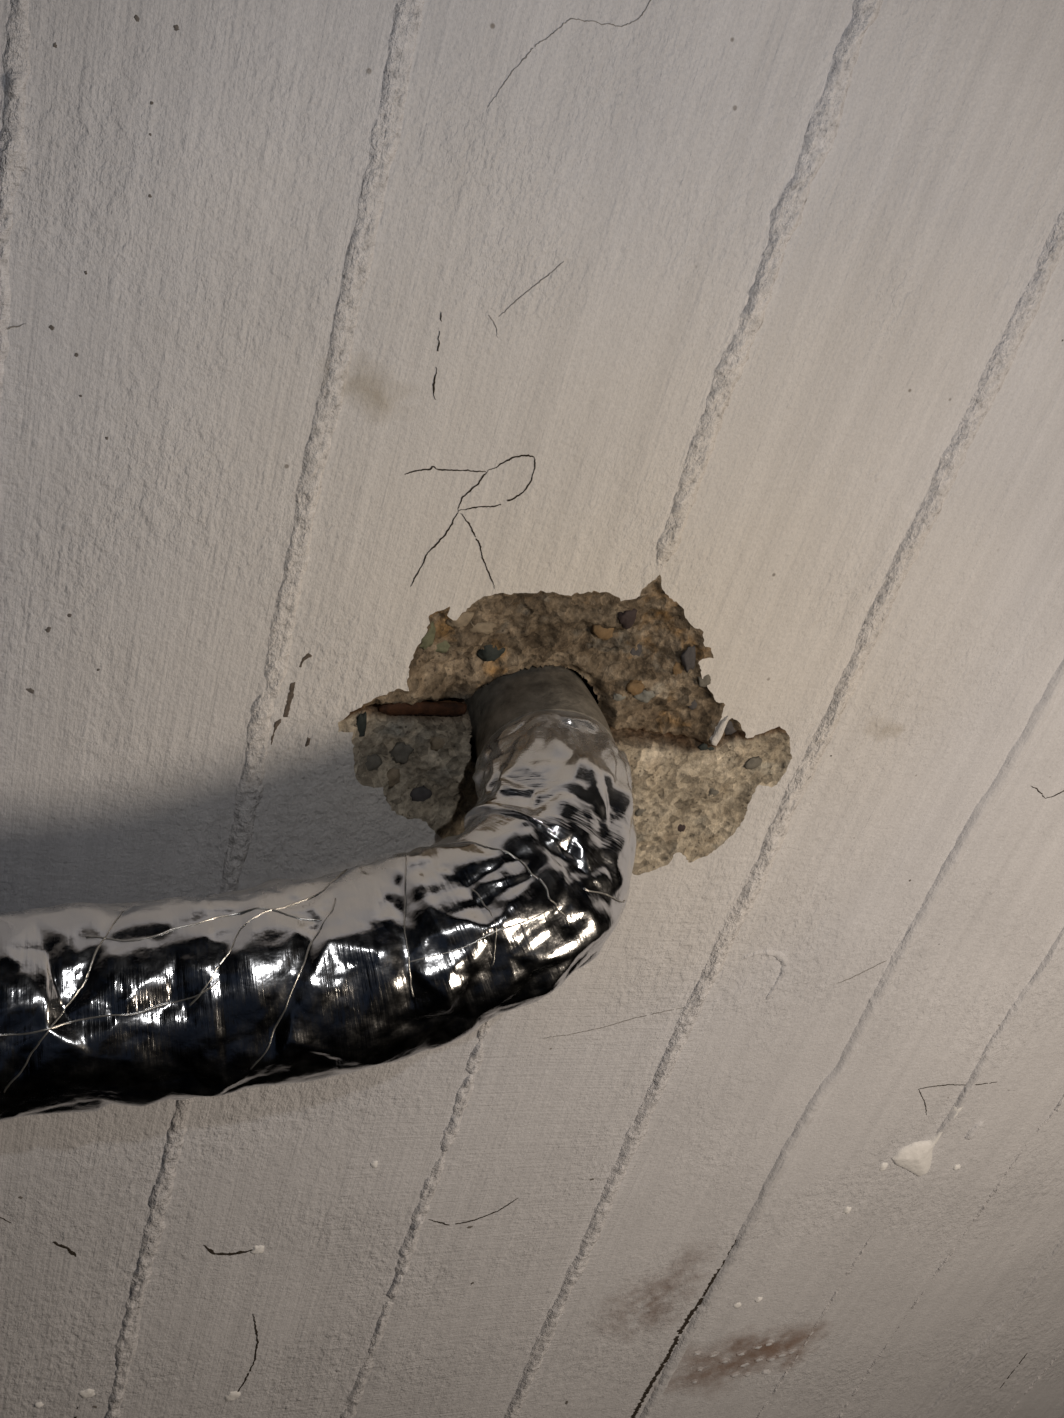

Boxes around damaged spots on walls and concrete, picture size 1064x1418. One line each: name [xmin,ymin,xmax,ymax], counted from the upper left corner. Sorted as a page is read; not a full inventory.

crack [405,454,536,589]
spalling [338,575,792,875]
crack [630,1240,736,1418]